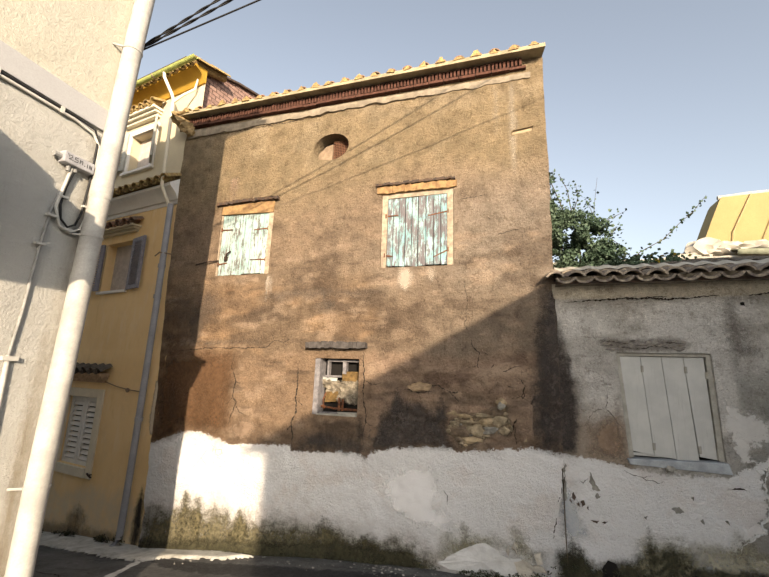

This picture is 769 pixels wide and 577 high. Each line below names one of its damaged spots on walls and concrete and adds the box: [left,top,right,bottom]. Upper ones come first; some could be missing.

crack [287,363,302,443]
spalling [405,382,432,393]
spalling [446,398,513,447]
damp [532,290,578,452]
spalling [561,464,589,510]
damp [313,521,338,545]
damp [647,539,683,576]